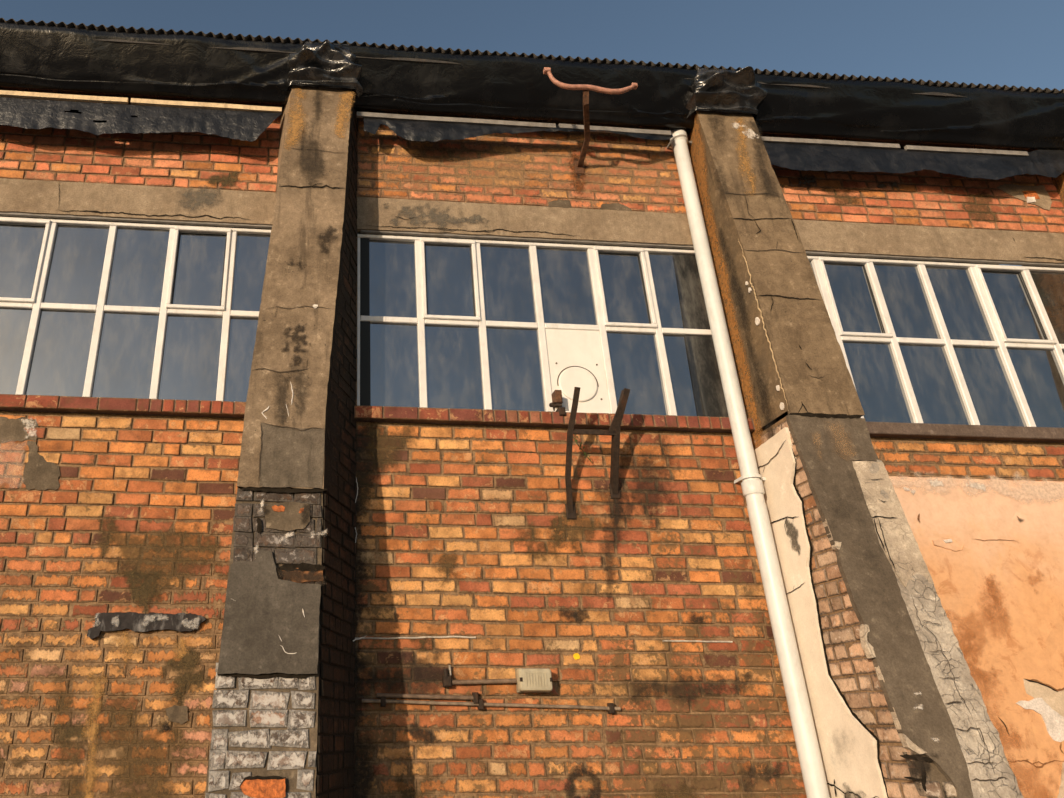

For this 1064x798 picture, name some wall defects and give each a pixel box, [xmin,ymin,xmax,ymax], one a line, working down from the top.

crack [719,175,802,253]
crack [790,402,862,419]
spalling [260,501,326,538]
water stain [553,489,623,554]
crack [871,479,896,568]
spalling [276,562,326,585]
spalling [860,624,884,681]
crack [911,595,1058,781]
water stain [83,673,105,798]
flaking render [1017,678,1064,798]
spalling [240,776,286,798]
water stain [565,765,601,798]